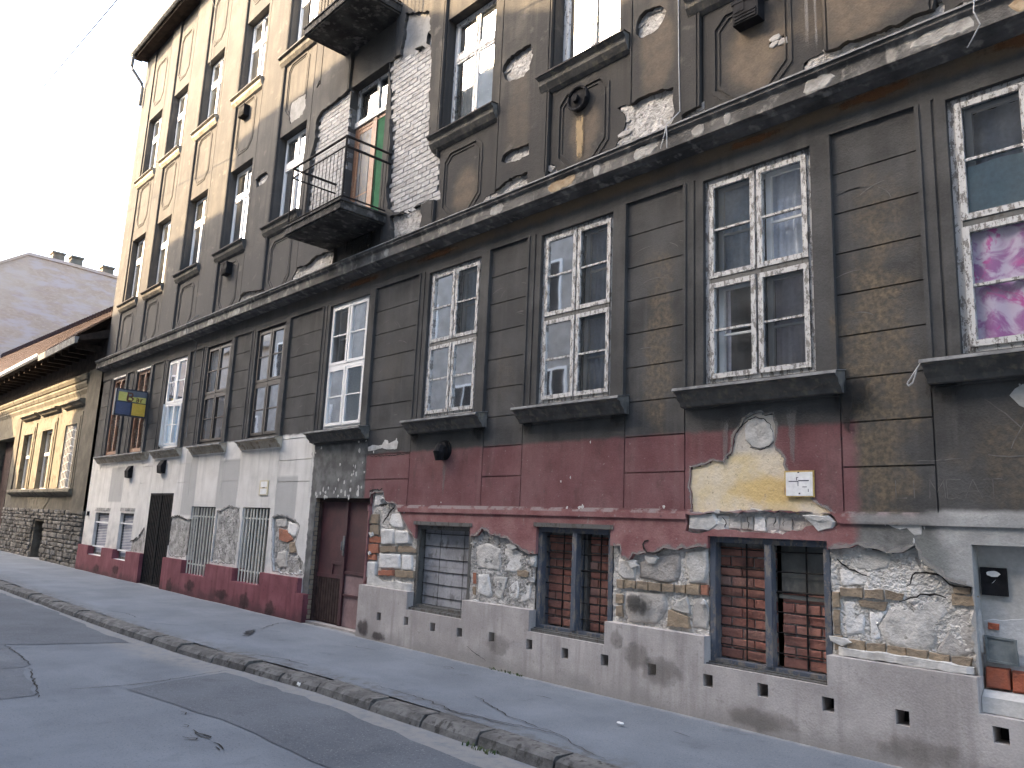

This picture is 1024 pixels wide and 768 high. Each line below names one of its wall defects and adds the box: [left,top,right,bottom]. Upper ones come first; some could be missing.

flaking render [639,7,666,38]
flaking render [504,47,533,81]
flaking render [309,91,354,211]
flaking render [384,42,440,257]
flaking render [617,90,675,160]
flaking render [168,515,191,558]
flaking render [271,515,304,576]
flaking render [315,438,417,591]
flaking render [469,527,538,609]
flaking render [613,411,838,635]
flaking render [828,524,1024,693]
crack [899,572,971,602]